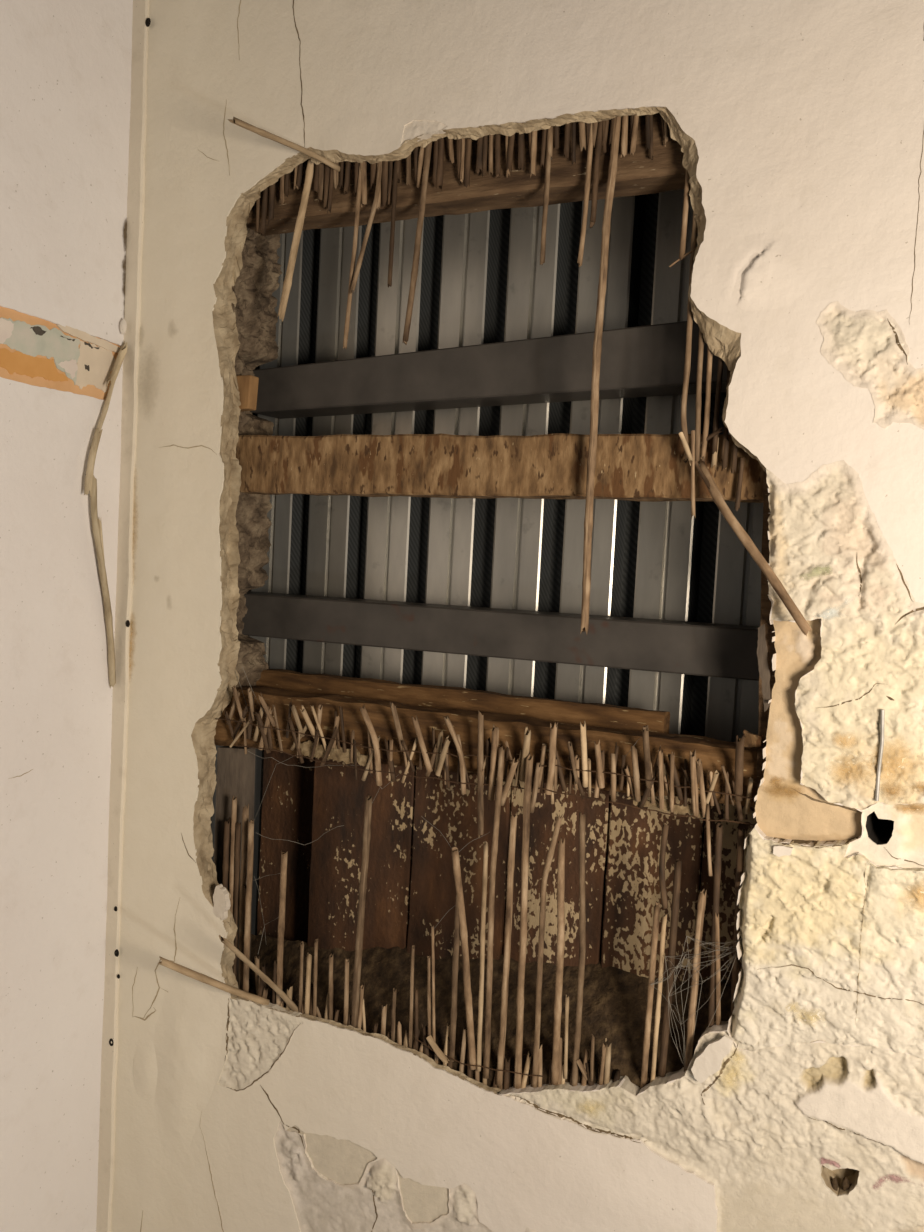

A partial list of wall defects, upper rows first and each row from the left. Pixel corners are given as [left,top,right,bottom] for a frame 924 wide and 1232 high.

crack [292,0,305,147]
peeling [0,306,121,400]
flaking render [191,107,924,1232]
crack [132,899,180,1021]
crack [200,1112,225,1232]